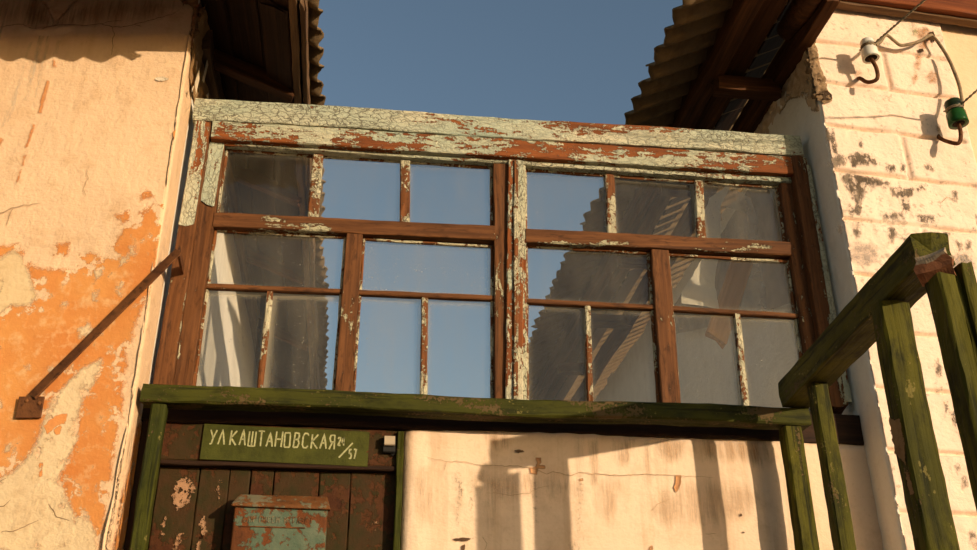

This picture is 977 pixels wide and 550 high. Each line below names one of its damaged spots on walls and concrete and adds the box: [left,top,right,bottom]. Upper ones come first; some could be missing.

flaking render [180,0,210,102]
flaking render [754,41,832,134]
peeling [0,191,163,550]
crack [432,458,710,495]